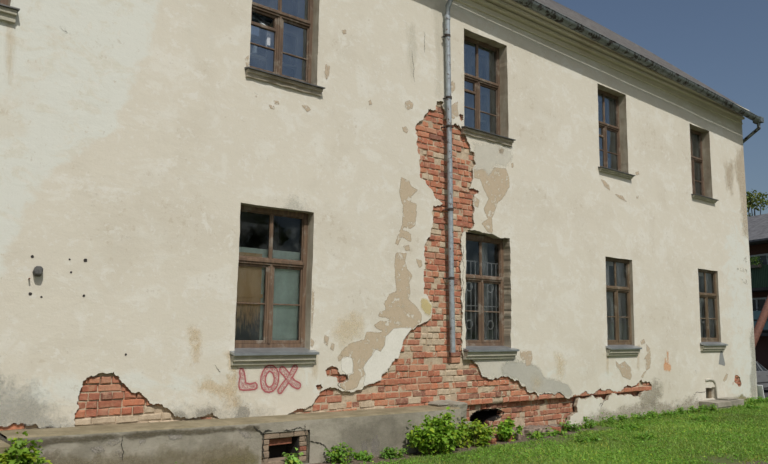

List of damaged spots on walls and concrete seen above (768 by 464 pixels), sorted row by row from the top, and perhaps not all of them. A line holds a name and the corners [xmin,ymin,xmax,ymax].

flaking render [74,373,218,426]
flaking render [289,102,652,435]